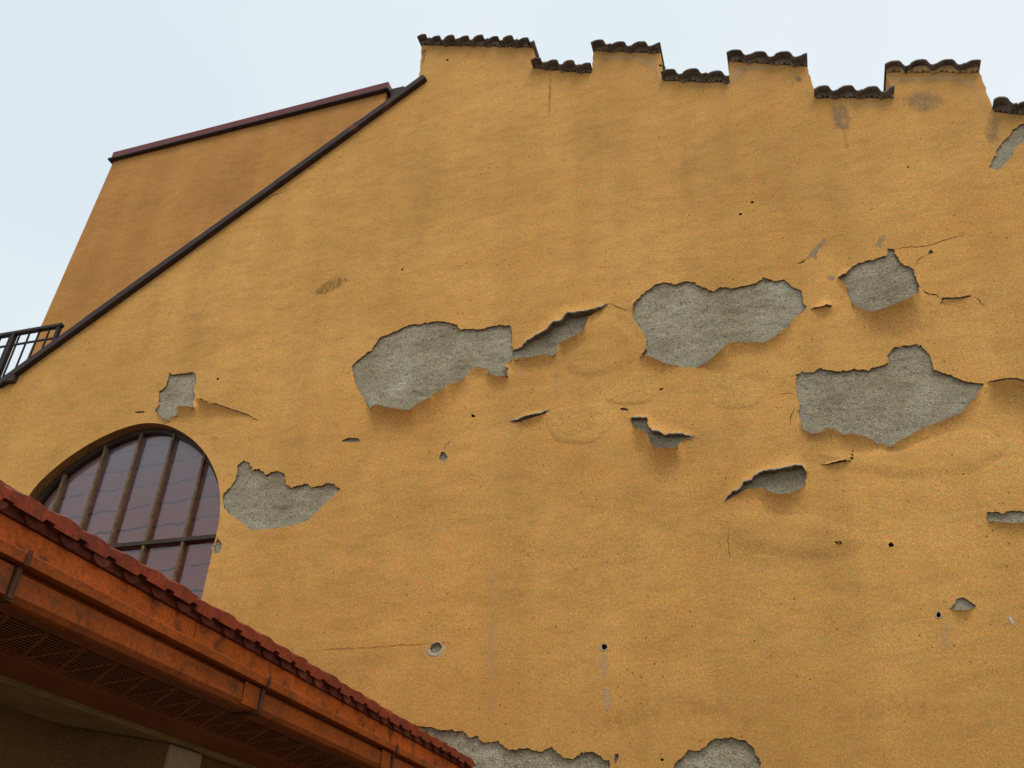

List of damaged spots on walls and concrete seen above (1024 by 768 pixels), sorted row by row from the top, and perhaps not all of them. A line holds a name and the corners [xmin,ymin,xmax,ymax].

spalling [155,372,212,425]
crack [197,398,257,421]
spalling [352,299,609,436]
spalling [627,277,807,375]
spalling [795,235,983,458]
crack [923,290,984,307]
spalling [627,410,697,484]
spalling [219,460,340,530]
spalling [724,453,810,515]
spalling [986,511,1024,538]
spalling [418,726,611,768]
spalling [661,737,761,768]